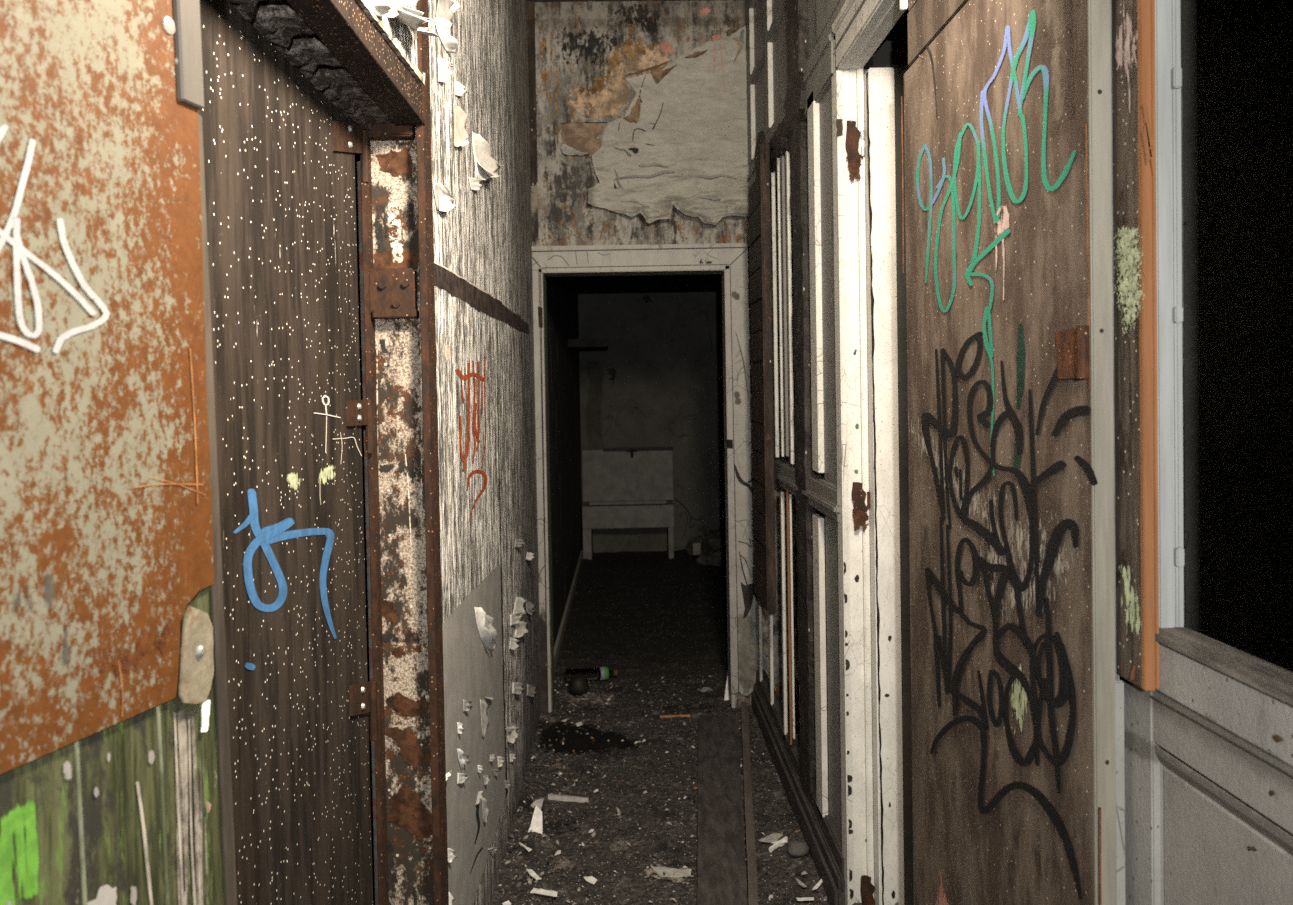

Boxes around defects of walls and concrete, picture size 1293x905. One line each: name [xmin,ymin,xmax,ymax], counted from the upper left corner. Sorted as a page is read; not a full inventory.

peeling [626,50,707,82]
peeling [355,0,501,190]
rust [376,147,414,177]
rust [846,154,864,181]
peeling [433,183,456,212]
rust [373,248,418,269]
rust [852,506,869,532]
peeling [475,596,535,651]
rust [385,693,427,771]
peeling [446,697,519,822]
rust [388,785,432,840]
peeling [519,798,544,852]